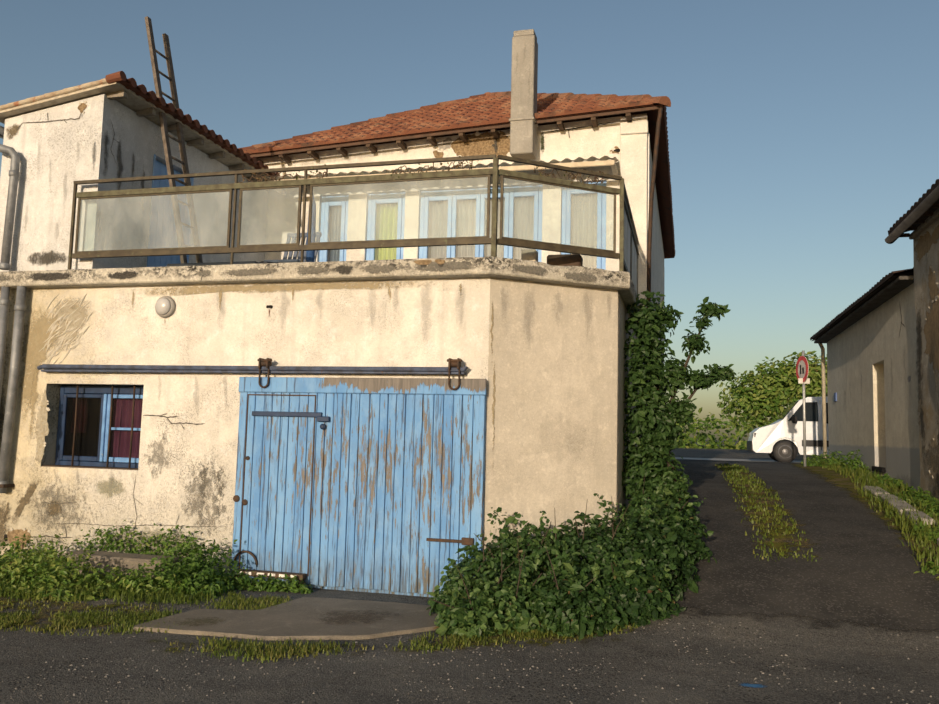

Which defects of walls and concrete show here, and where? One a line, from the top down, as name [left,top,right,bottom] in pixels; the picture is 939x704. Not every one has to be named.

crack [17,112,81,129]
spalling [433,130,512,161]
leakage [29,251,66,265]
spalling [914,222,939,373]
leakage [916,312,925,458]
crack [143,413,205,429]
leakage [0,483,37,547]